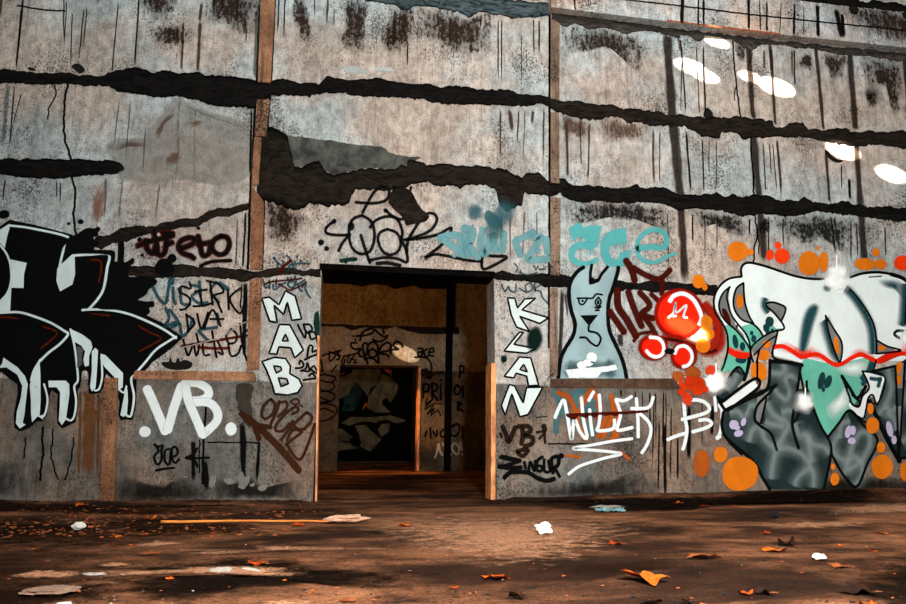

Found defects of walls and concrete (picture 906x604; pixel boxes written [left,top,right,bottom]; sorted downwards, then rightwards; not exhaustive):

crack [16,4,65,12]
water stain [277,0,315,41]
water stain [381,8,502,78]
crack [732,41,742,117]
water stain [735,44,777,124]
crack [626,0,898,30]
water stain [791,49,906,129]
crack [47,72,77,235]
crack [175,0,276,270]
crack [545,13,553,348]
water stain [751,137,782,196]
water stain [841,145,864,205]